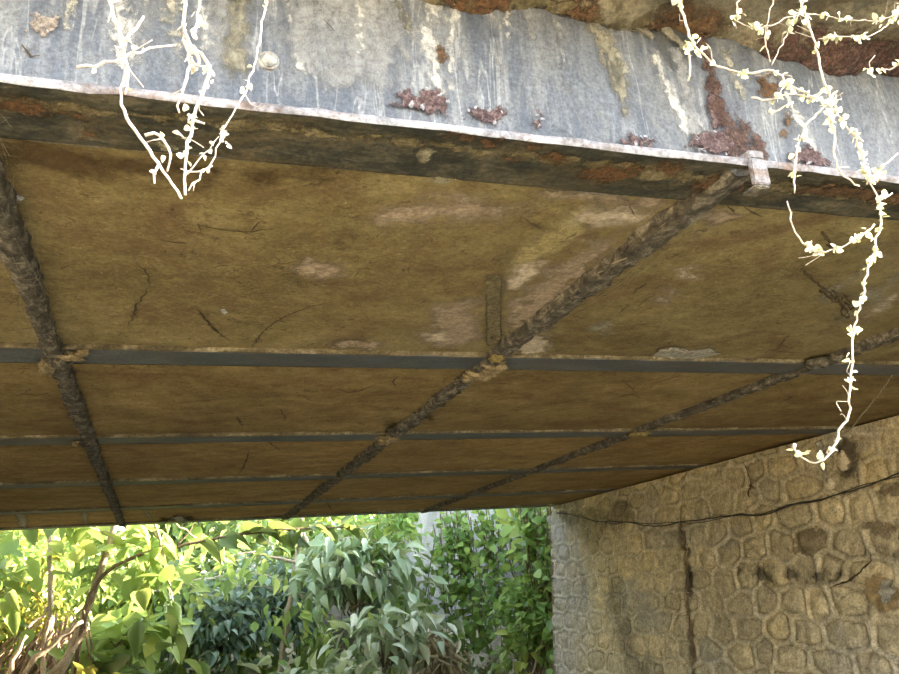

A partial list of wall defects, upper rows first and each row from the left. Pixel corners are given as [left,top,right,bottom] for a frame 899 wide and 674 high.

corrosion [757,22,899,77]
corrosion [645,0,770,161]
crack [128,265,151,325]
crack [196,306,227,339]
crack [251,302,332,348]
peeling [651,347,721,359]